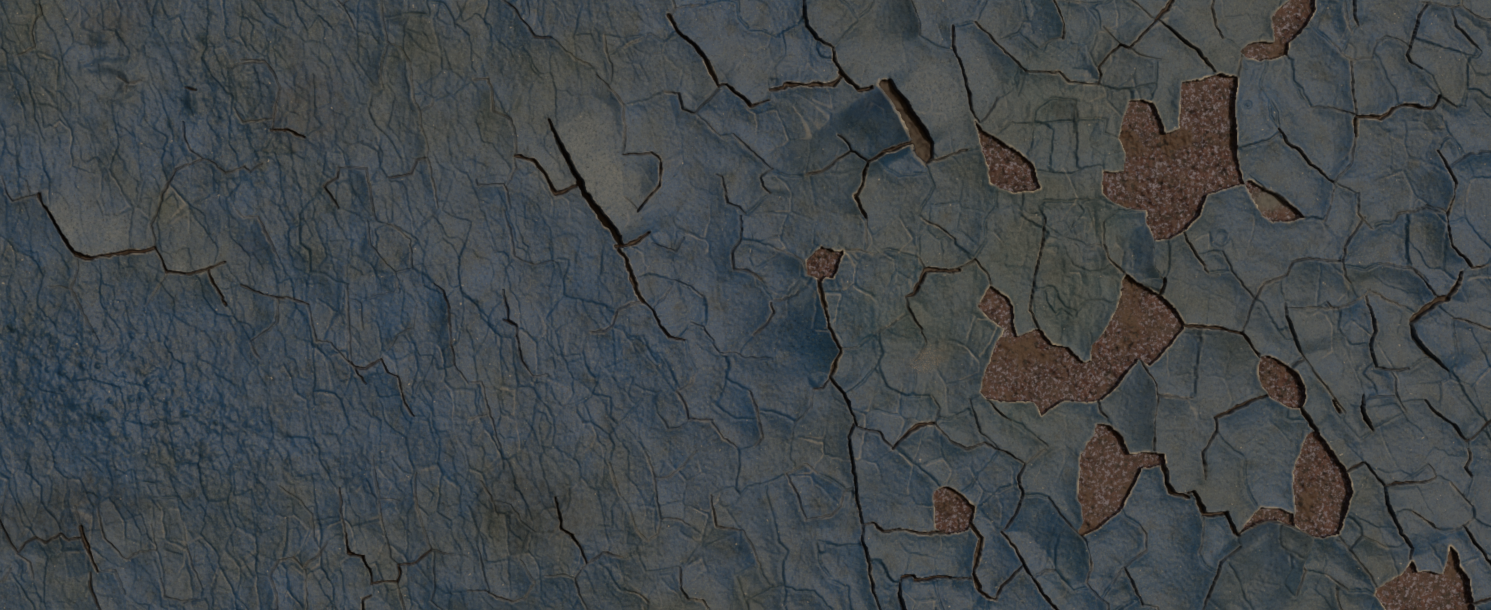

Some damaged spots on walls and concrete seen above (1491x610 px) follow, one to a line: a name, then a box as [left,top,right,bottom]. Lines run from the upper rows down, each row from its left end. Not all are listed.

crack [17,0,82,57]
crack [144,0,502,450]
crack [268,0,1160,610]
peeling [972,119,1044,197]
crack [911,0,1243,164]
peeling [976,271,1188,541]
peeling [1100,0,1319,244]
peeling [1255,353,1310,412]
crack [1084,0,1491,610]
crack [0,505,204,610]
peeling [1234,426,1357,598]
peeling [1372,543,1478,610]